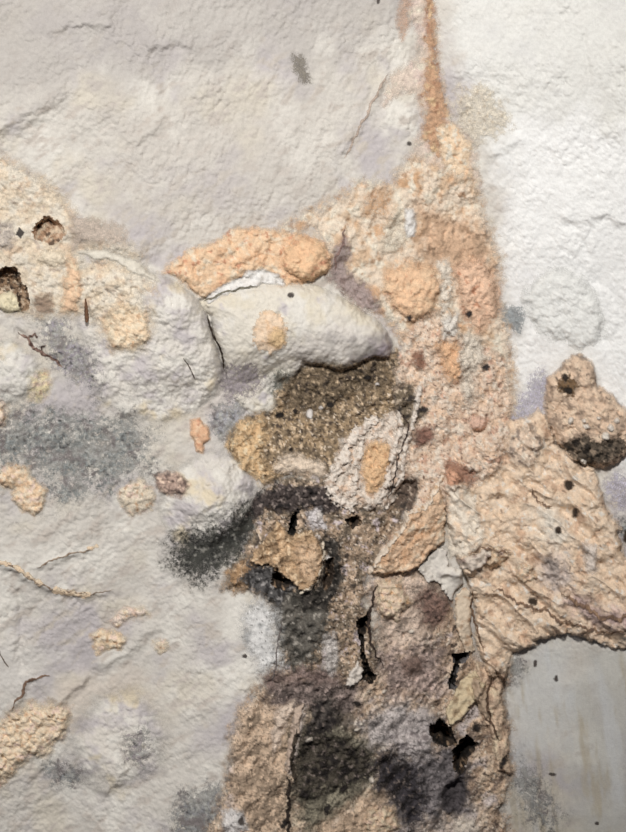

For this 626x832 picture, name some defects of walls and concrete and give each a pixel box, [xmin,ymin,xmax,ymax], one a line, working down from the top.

rust [382,0,482,198]
damp [0,401,159,503]
crack [0,544,111,599]
damp [159,498,264,591]
flaking render [206,258,515,832]